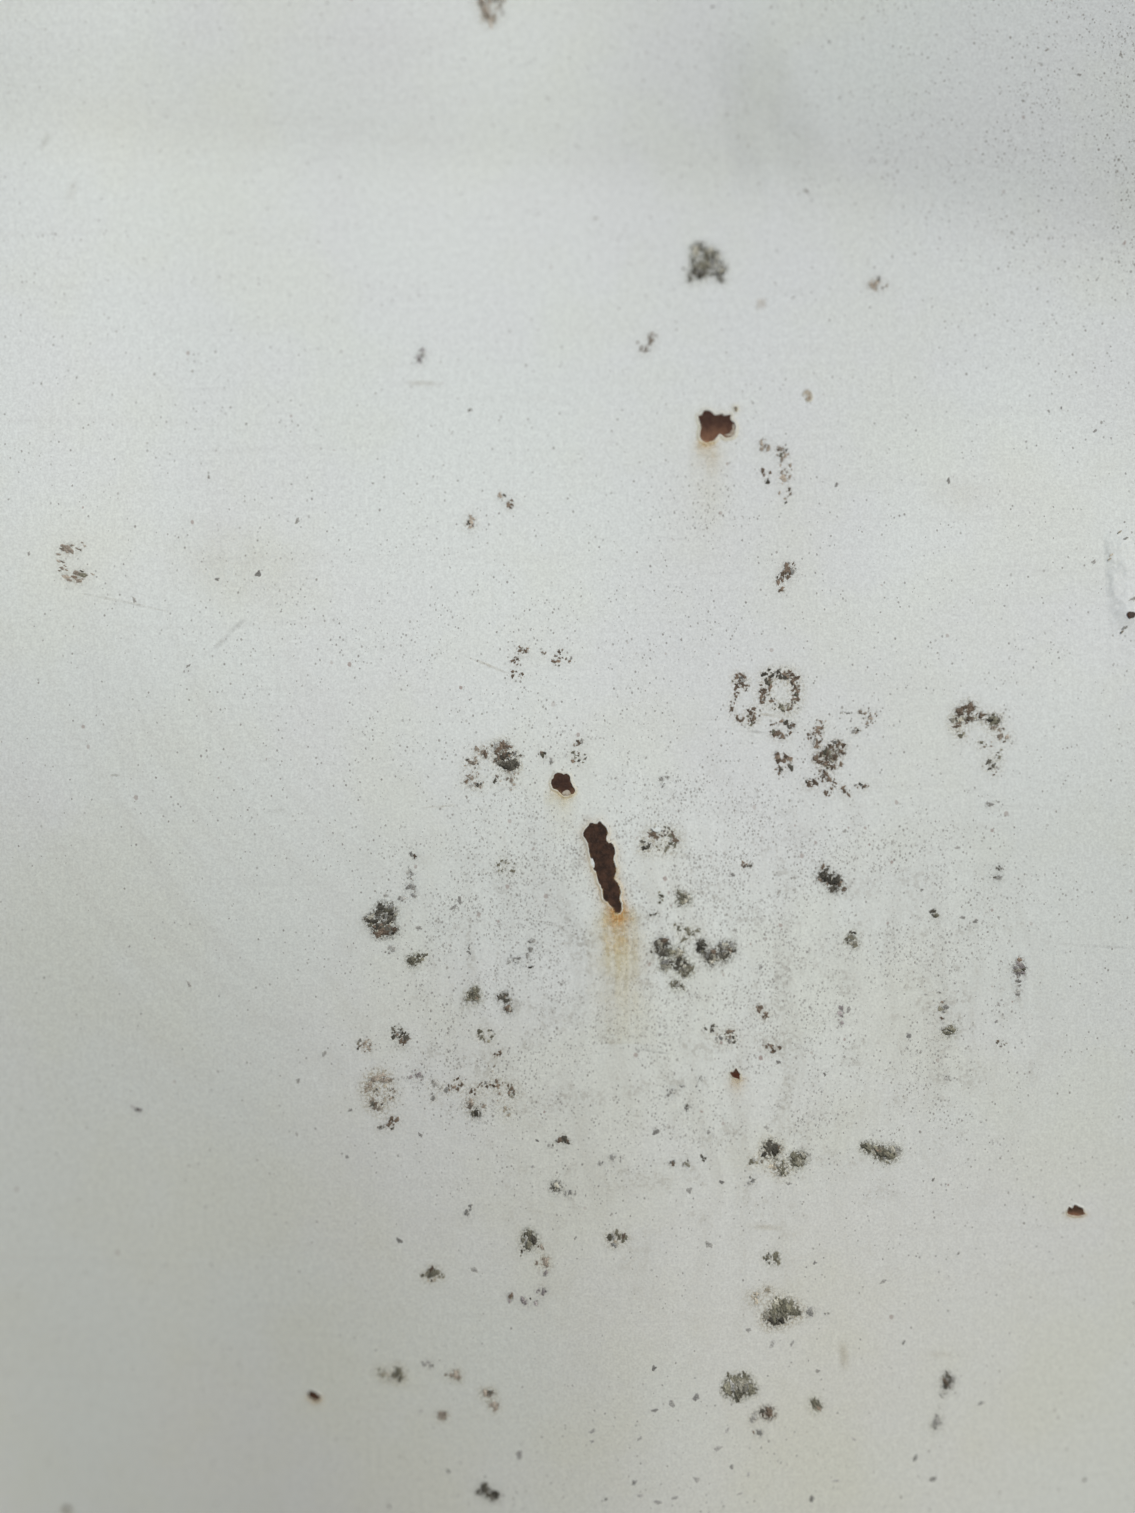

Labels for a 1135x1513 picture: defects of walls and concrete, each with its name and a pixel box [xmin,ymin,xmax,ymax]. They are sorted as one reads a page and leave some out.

rust [580,818,627,968]